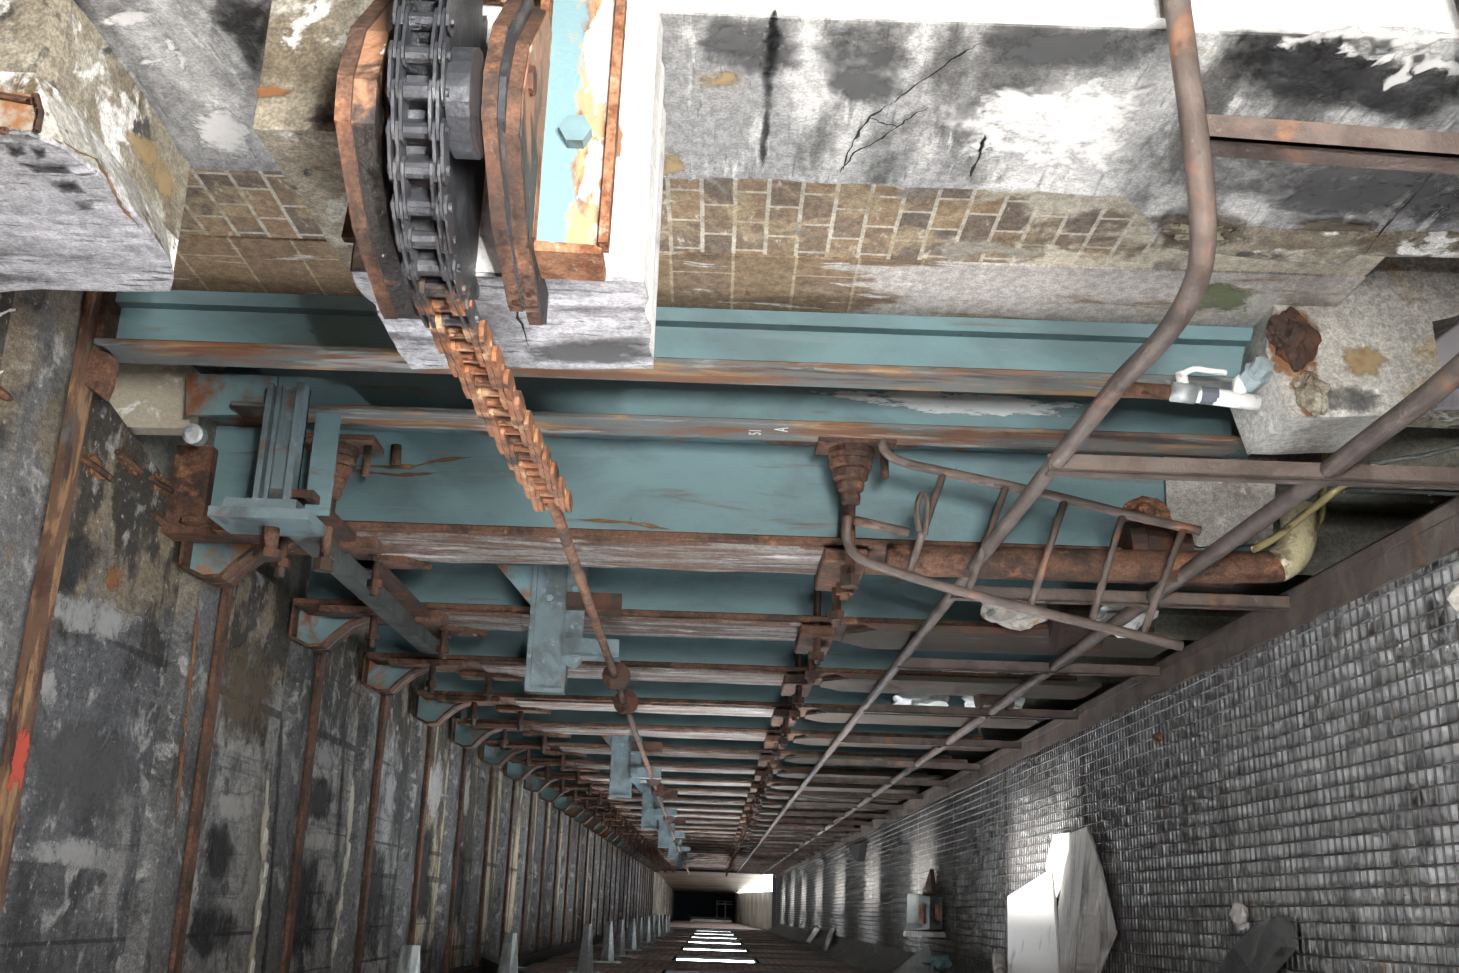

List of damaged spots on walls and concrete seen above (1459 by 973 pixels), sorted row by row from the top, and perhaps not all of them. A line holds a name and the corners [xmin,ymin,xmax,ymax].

leakage [211,0,267,71]
leakage [1279,25,1459,91]
crack [840,44,978,172]
rust [1269,343,1318,389]